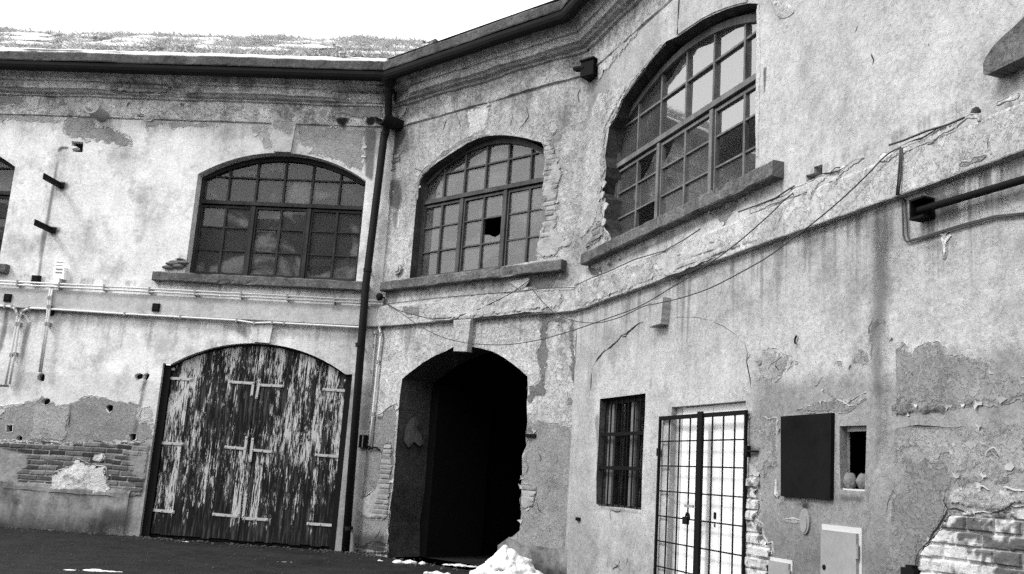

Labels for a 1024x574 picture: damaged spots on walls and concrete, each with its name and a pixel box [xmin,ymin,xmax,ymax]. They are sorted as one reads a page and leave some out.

peeling [0,95,133,152]
peeling [536,29,666,259]
spalling [878,113,982,162]
spalling [959,153,991,167]
spalling [996,93,1020,108]
spalling [402,156,869,405]
peeling [940,232,952,260]
crack [567,322,641,399]
flaking render [0,394,155,497]
peeling [353,402,423,555]
peeling [515,420,572,550]
flaking render [891,340,1024,574]